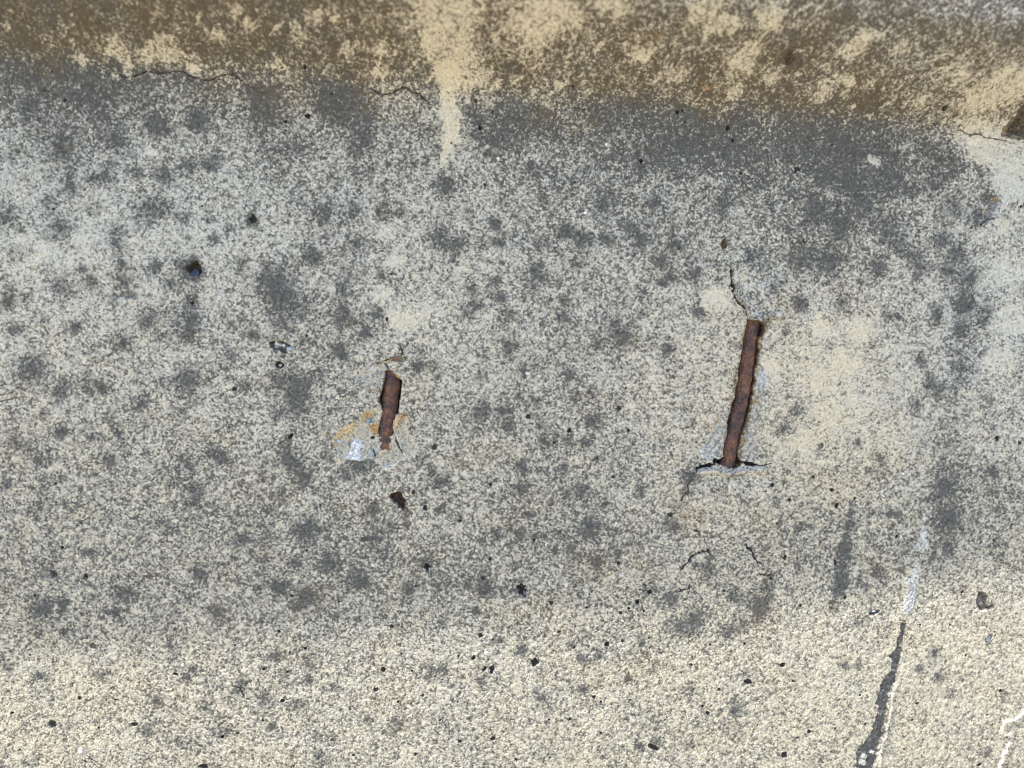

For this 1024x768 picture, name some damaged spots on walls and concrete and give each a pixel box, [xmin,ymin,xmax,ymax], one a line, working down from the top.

spalling [330,341,424,473]
corrosion [379,357,402,450]
spalling [697,318,772,468]
corrosion [718,320,760,469]